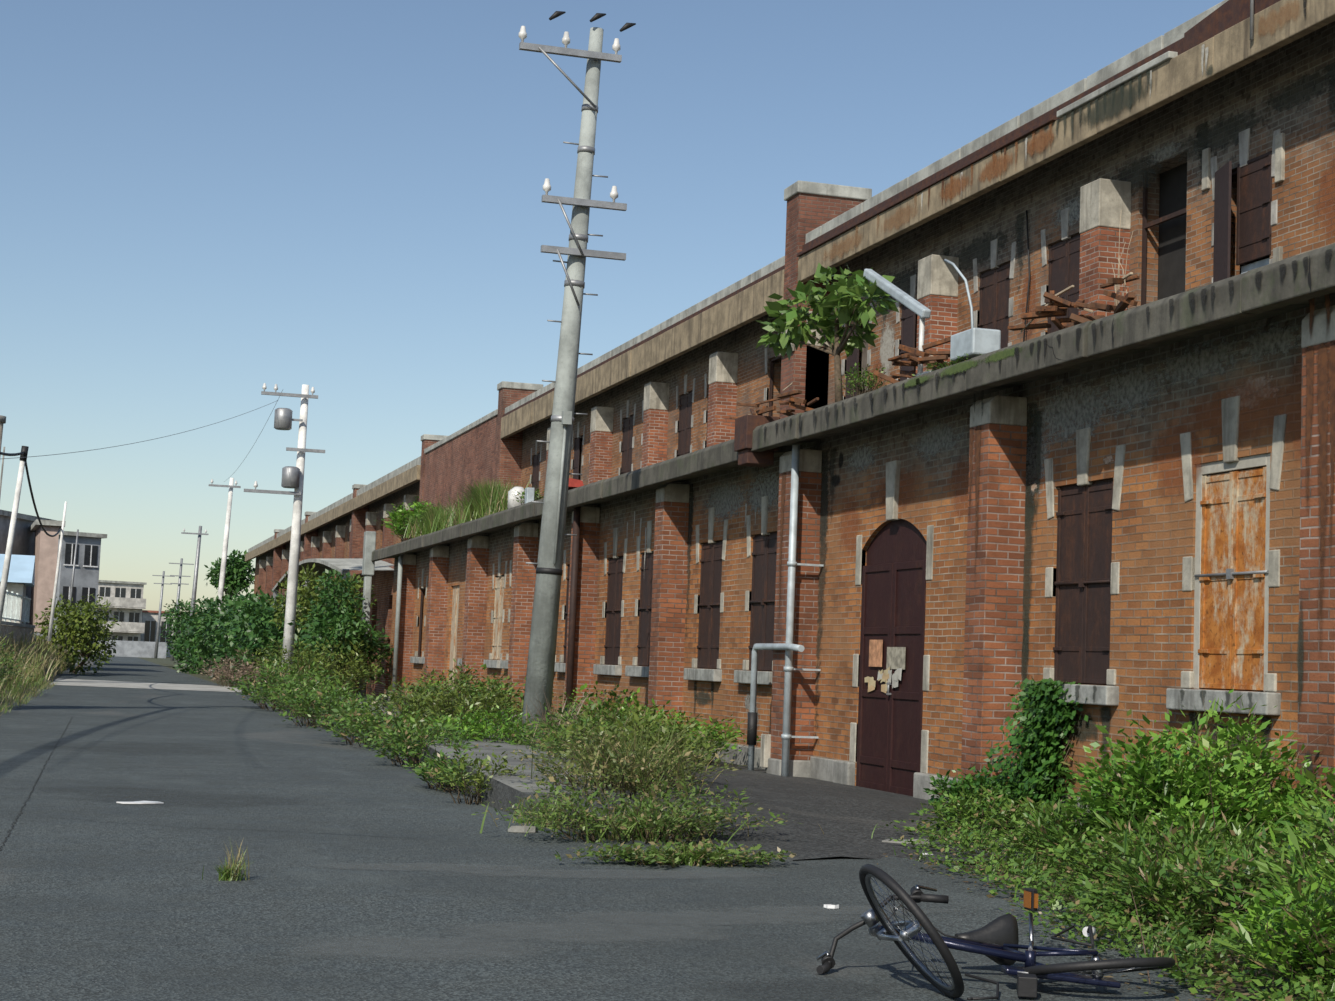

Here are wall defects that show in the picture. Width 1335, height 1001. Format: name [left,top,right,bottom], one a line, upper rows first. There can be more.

water stain [1279,257,1308,280]
water stain [1169,280,1233,317]